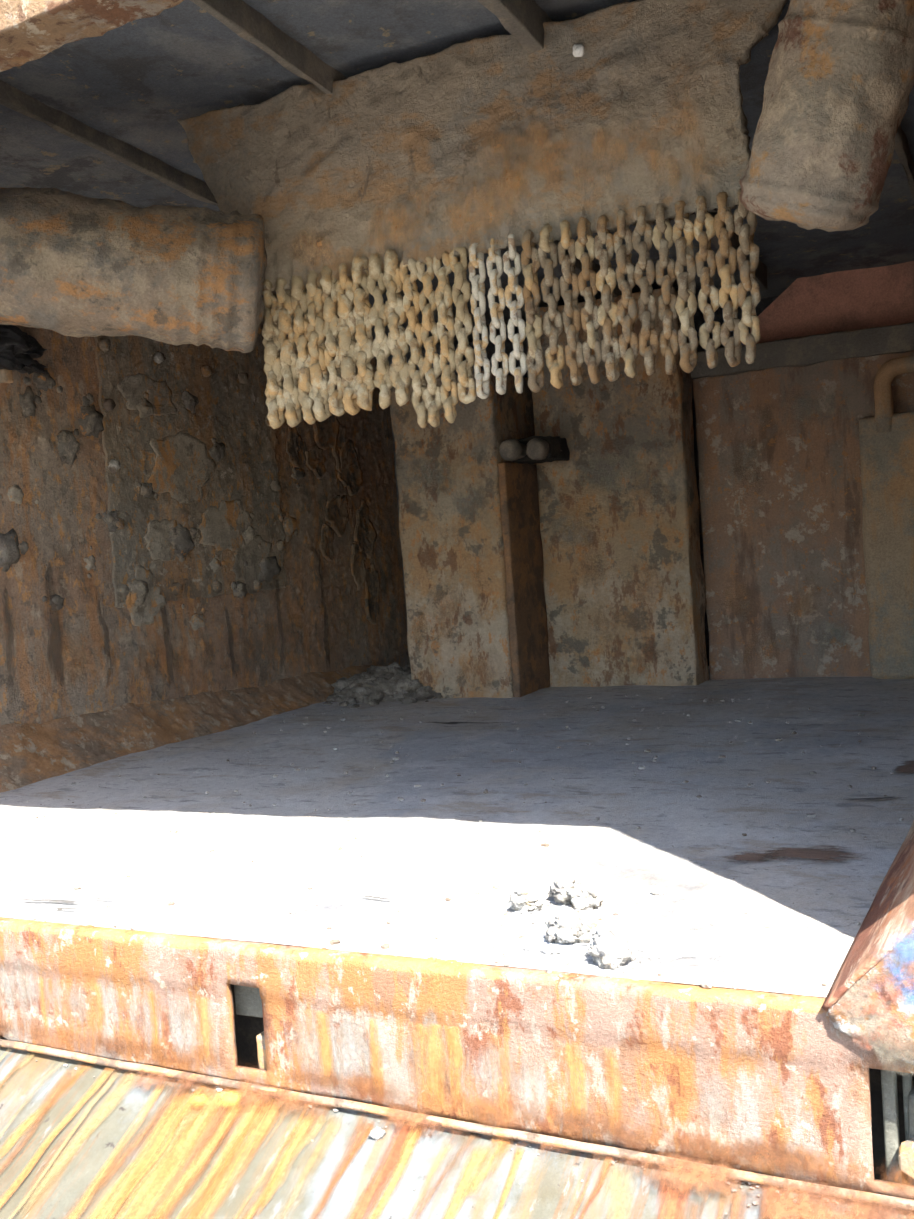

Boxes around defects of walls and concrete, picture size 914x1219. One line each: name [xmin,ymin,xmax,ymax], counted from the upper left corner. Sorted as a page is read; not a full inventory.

corrosion [286,407,380,625]
corrosion [86,985,212,1064]
corrosion [0,1012,342,1219]
corrosion [312,1120,372,1219]
corrosion [349,1020,439,1219]
corrosion [418,1025,462,1103]
corrosion [416,1057,523,1219]
corrosion [558,1045,639,1141]
corrosion [570,1135,914,1219]
peeling [848,935,914,1049]